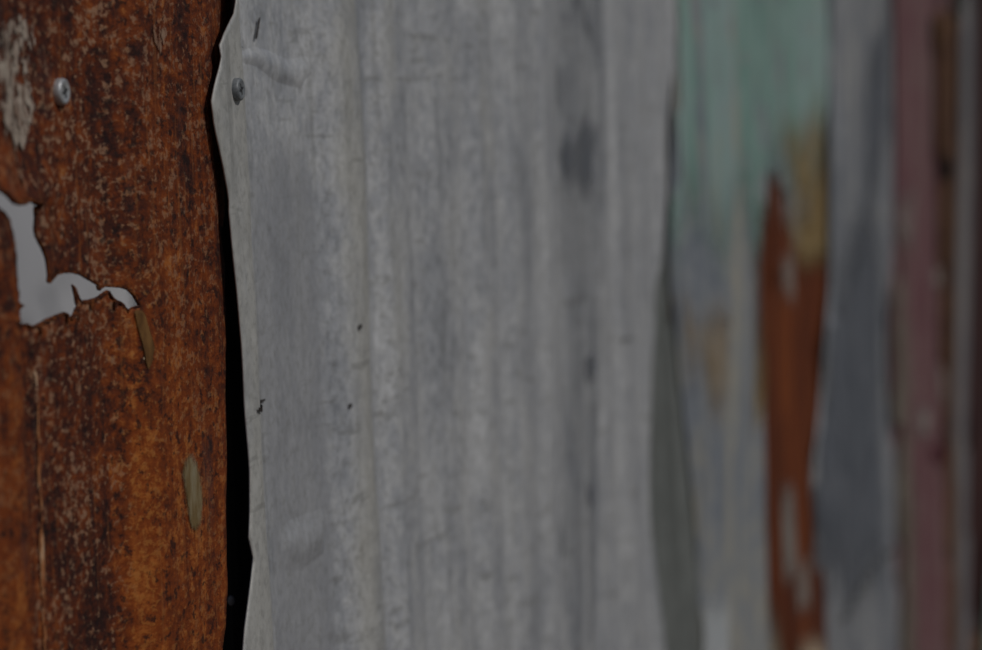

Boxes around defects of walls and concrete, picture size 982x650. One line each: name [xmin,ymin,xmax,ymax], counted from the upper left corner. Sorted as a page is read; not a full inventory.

peeling [0,15,36,187]
rust [753,124,830,650]